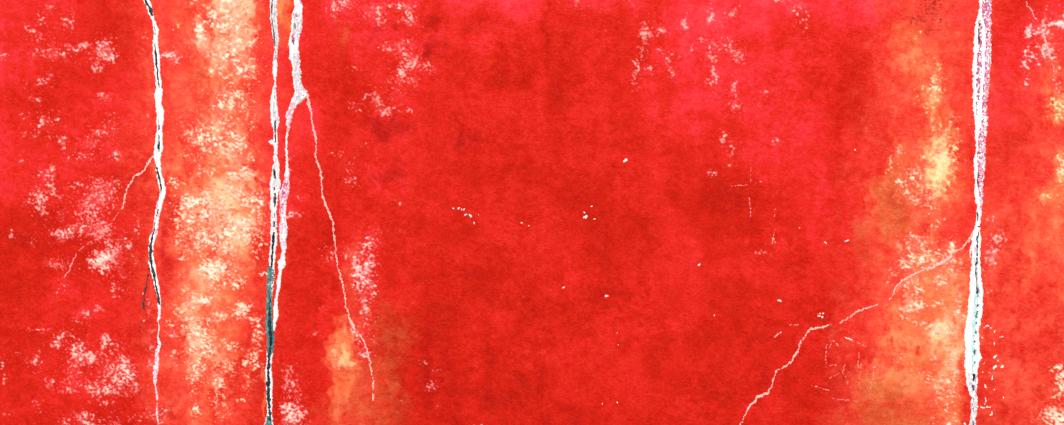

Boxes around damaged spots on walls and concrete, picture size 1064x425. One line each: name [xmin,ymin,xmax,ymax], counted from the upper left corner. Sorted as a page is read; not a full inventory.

crack [56,0,170,424]
rust [103,0,313,425]
crack [259,0,375,425]
crack [740,0,993,425]
rust [812,0,1064,425]
crack [1026,2,1059,92]
peeling [1022,357,1064,425]